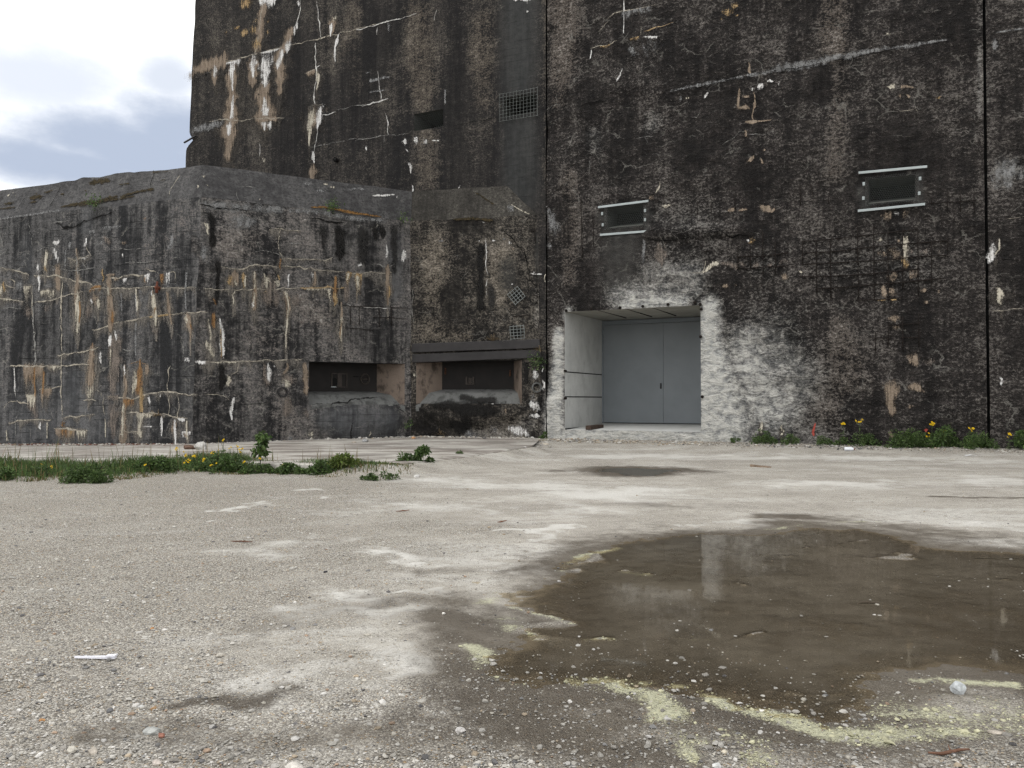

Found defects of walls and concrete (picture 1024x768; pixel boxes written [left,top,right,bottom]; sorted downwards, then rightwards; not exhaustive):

efflorescence [189,0,296,168]
efflorescence [304,69,324,179]
crack [226,1,437,150]
efflorescence [328,17,339,62]
corrosion [10,247,150,444]
crack [0,186,414,441]
damp [208,212,216,247]
damp [320,224,406,320]
spalling [700,213,950,366]